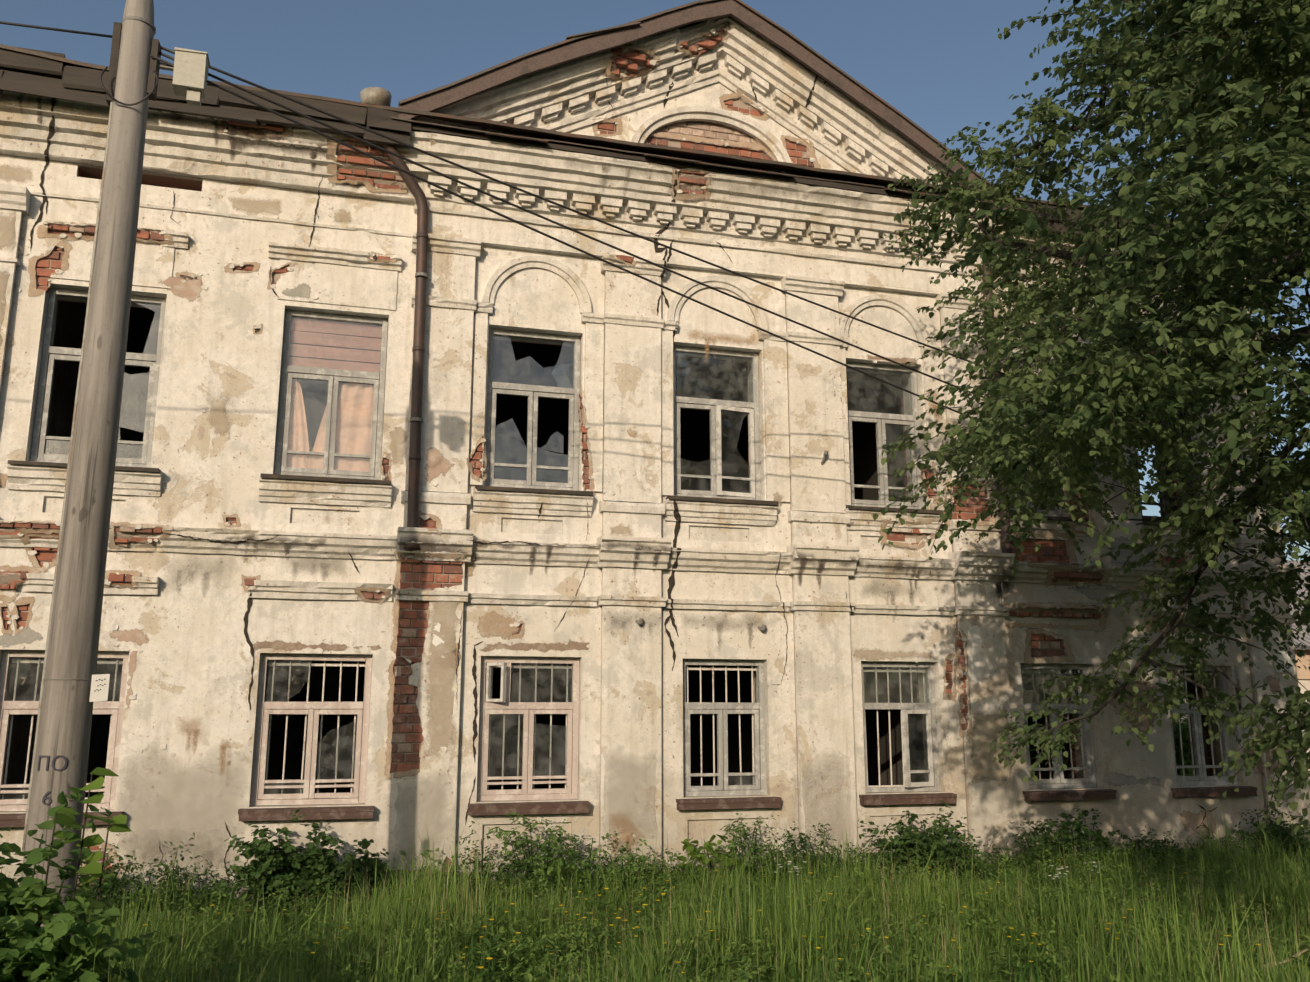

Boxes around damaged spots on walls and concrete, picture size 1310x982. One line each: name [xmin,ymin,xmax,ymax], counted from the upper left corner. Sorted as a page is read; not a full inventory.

crack [30,98,56,251]
spalling [326,132,407,194]
crack [663,81,674,107]
spalling [644,89,820,201]
spalling [0,216,96,346]
crack [654,169,678,352]
spalling [0,520,61,649]
crack [243,592,254,710]
spalling [242,550,590,782]
crack [456,612,483,825]
crack [664,500,681,671]
peeling [851,625,1013,781]